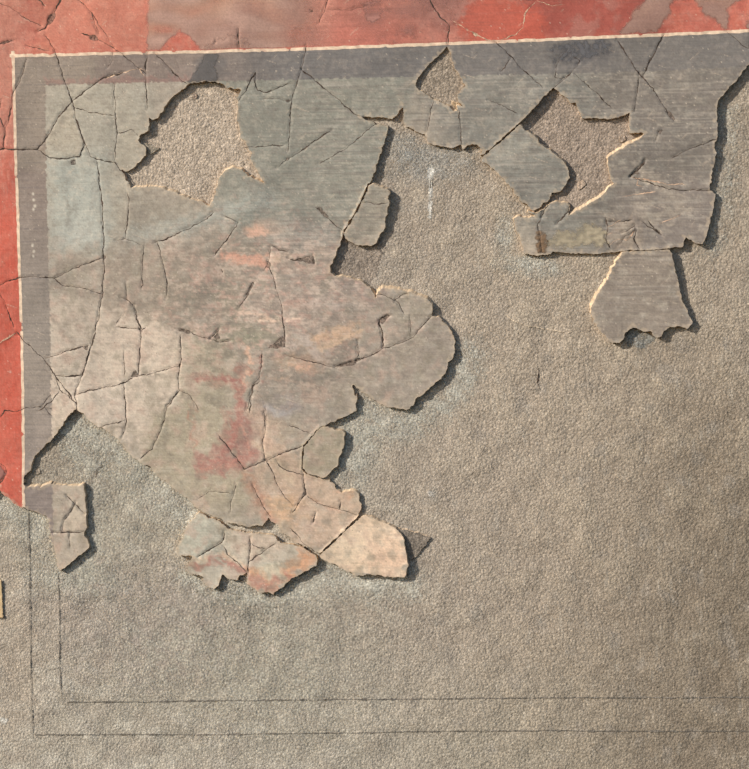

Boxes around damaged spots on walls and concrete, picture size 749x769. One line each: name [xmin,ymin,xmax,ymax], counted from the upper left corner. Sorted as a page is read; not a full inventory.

crack [0,0,238,459]
spalling [123,81,262,205]
crack [239,48,375,164]
spalling [331,230,386,285]
spalling [416,48,465,110]
crack [430,0,610,106]
spalling [521,89,642,214]
crack [617,37,675,140]
crack [629,162,711,196]
spalling [24,410,126,486]
crack [201,245,431,551]
crack [199,533,274,571]